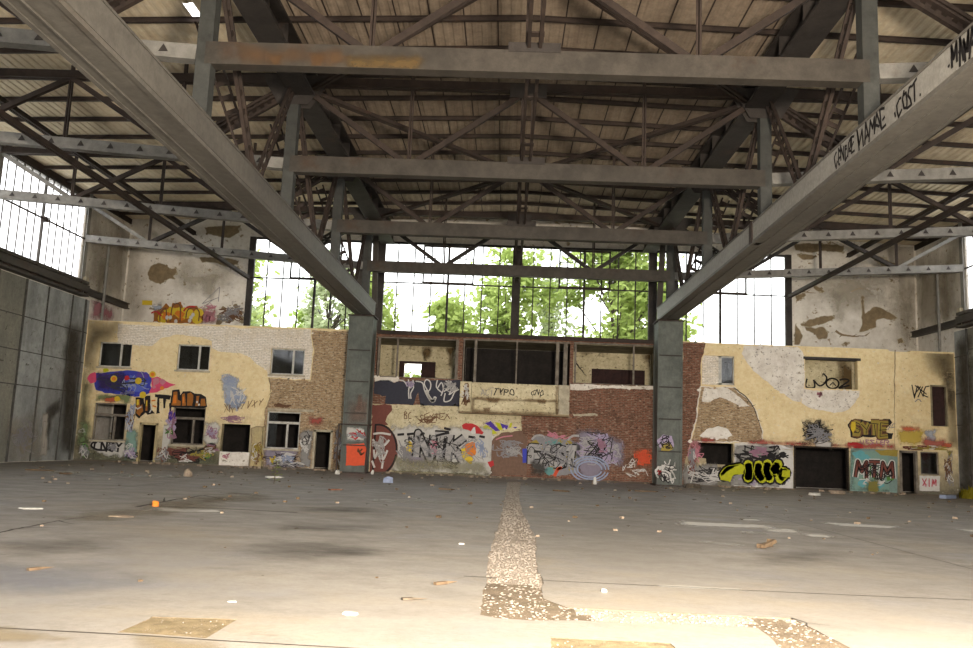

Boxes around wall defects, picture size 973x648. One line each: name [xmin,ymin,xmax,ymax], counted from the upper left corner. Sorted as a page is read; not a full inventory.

flaking render [204,225,241,238]
flaking render [147,263,178,284]
flaking render [199,257,239,267]
flaking render [794,243,845,260]
flaking render [859,296,897,333]
flaking render [742,315,860,413]
flaking render [117,304,348,470]
flaking render [682,341,763,484]